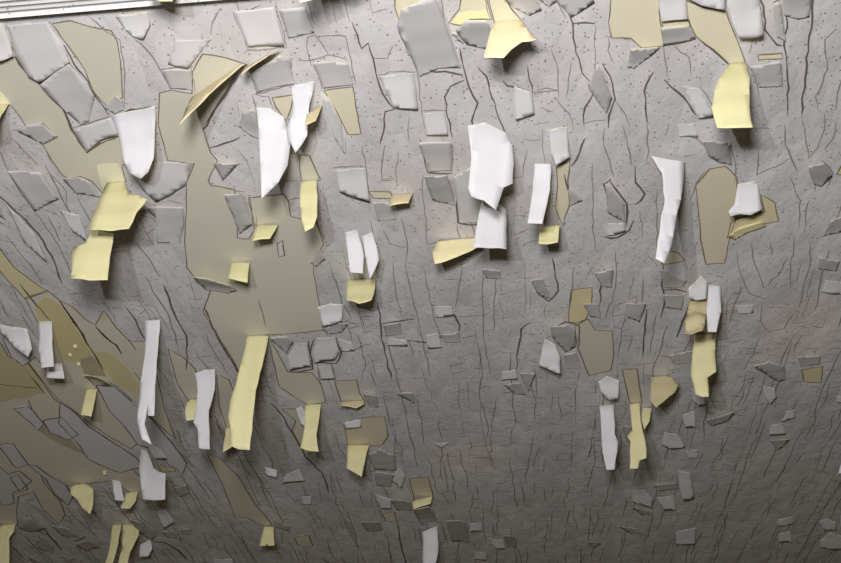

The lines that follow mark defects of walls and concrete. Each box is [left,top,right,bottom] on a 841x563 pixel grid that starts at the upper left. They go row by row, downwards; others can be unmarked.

crack [11,13,195,153]
crack [0,129,239,373]
crack [203,64,252,130]
peeling [0,0,482,563]
crack [245,0,479,245]
crack [478,55,512,132]
peeling [527,127,582,245]
peeling [502,269,679,470]
peeling [662,432,698,458]
peeling [651,156,721,428]
peeling [607,0,783,265]
crack [747,0,837,233]